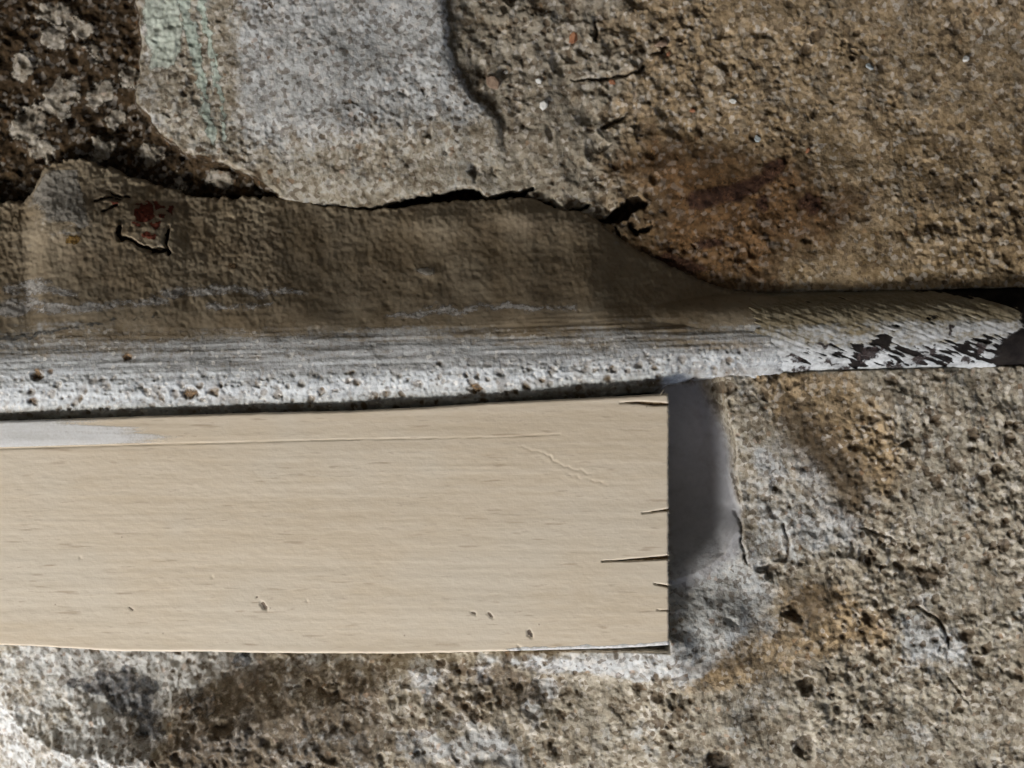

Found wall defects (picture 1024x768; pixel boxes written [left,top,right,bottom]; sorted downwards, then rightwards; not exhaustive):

spalling [0,0,279,203]
crack [366,189,653,237]
rust [614,134,863,292]
peeling [786,353,809,373]
peeling [817,342,936,370]
peeling [942,342,987,367]